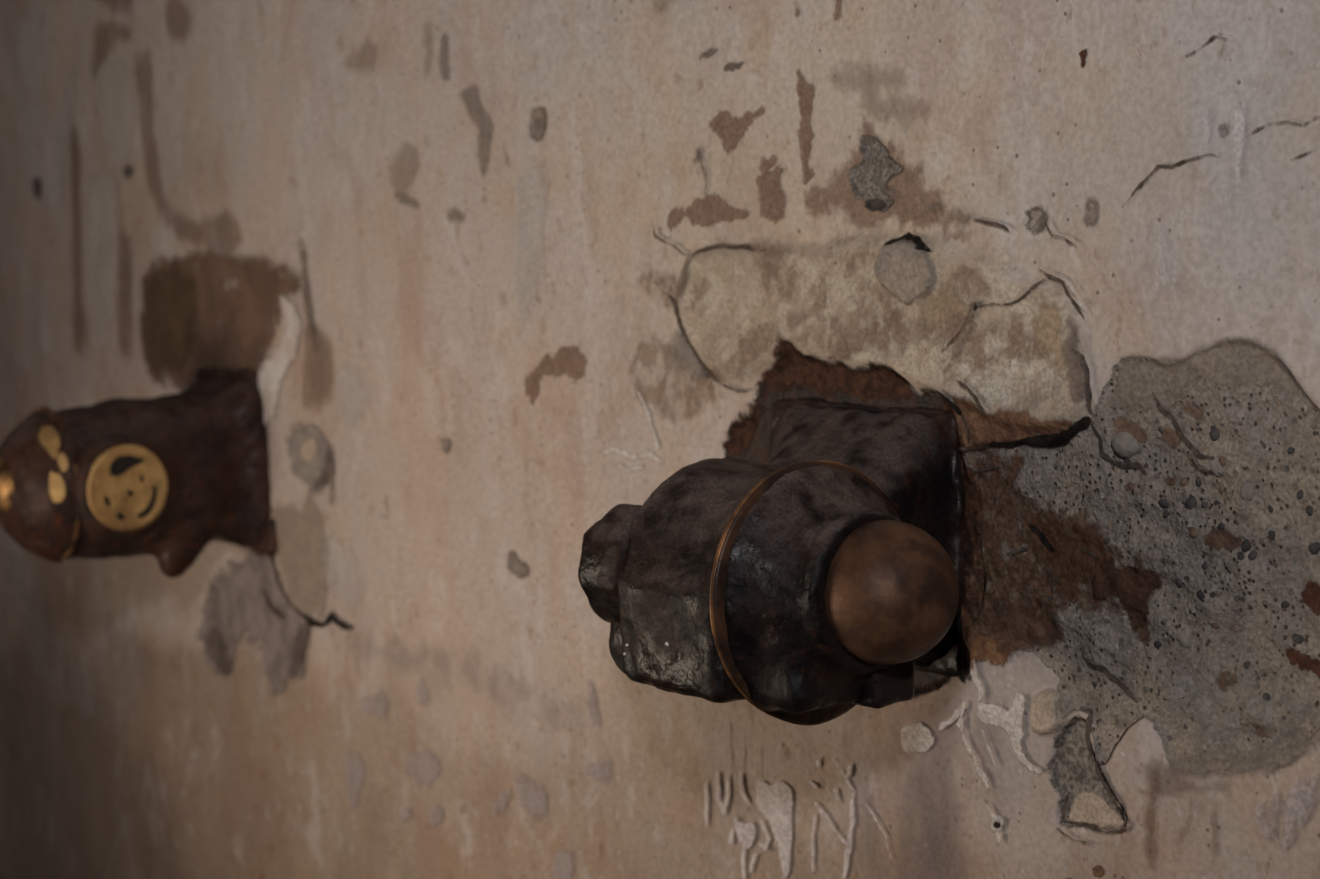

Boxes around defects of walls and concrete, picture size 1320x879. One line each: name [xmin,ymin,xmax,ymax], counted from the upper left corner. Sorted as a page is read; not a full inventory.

peeling [667,156,785,232]
peeling [709,106,764,154]
peeling [796,70,949,236]
crack [884,188,1010,252]
crack [1131,154,1216,196]
crack [1252,117,1317,159]
crack [652,224,785,393]
crack [936,270,1146,474]
spalling [196,423,332,695]
corrosion [722,338,1162,679]
spalling [968,338,1320,830]
corrosion [911,670,949,700]